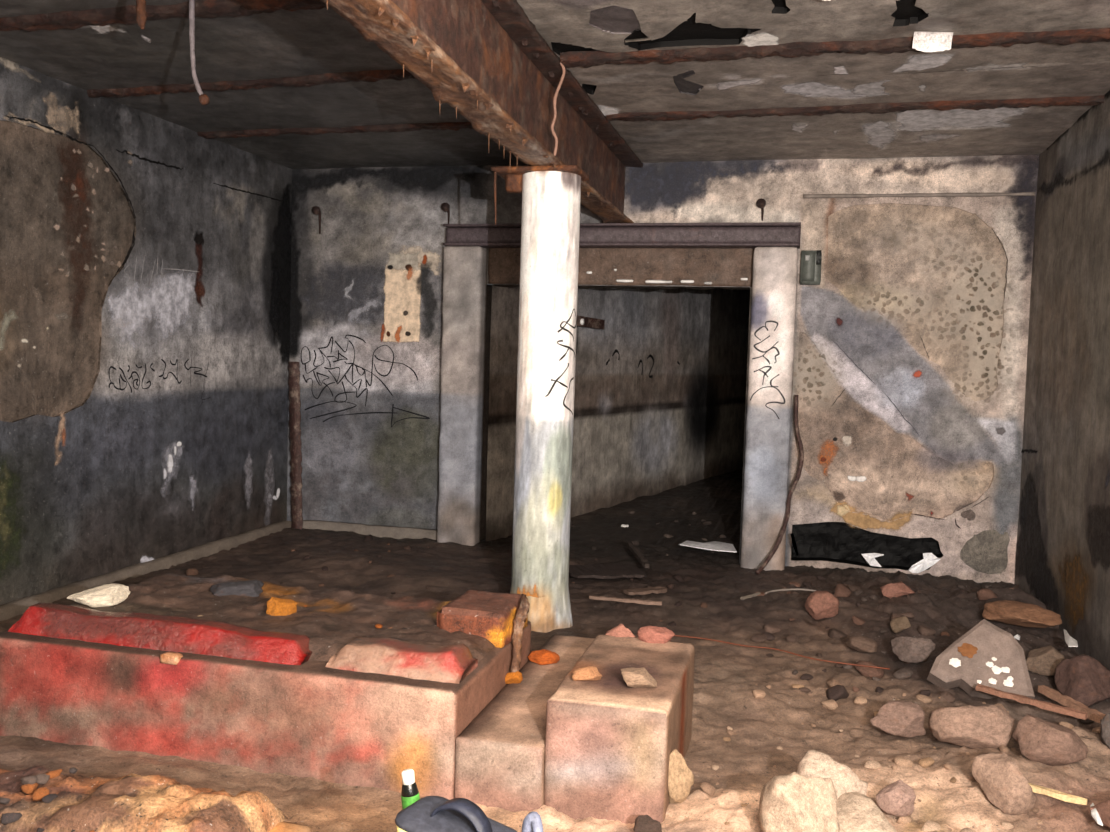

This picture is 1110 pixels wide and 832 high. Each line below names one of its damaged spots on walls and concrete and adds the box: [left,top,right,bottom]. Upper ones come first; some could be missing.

peeling [551,5,778,55]
peeling [782,0,953,97]
crack [6,116,183,275]
crack [213,183,285,202]
leakage [1041,149,1110,194]
spalling [0,95,136,423]
corrosion [194,232,205,307]
flaking render [381,252,427,342]
spalling [824,203,1007,401]
spalling [791,331,994,571]
leakage [1015,473,1058,610]
leakage [1087,506,1110,568]